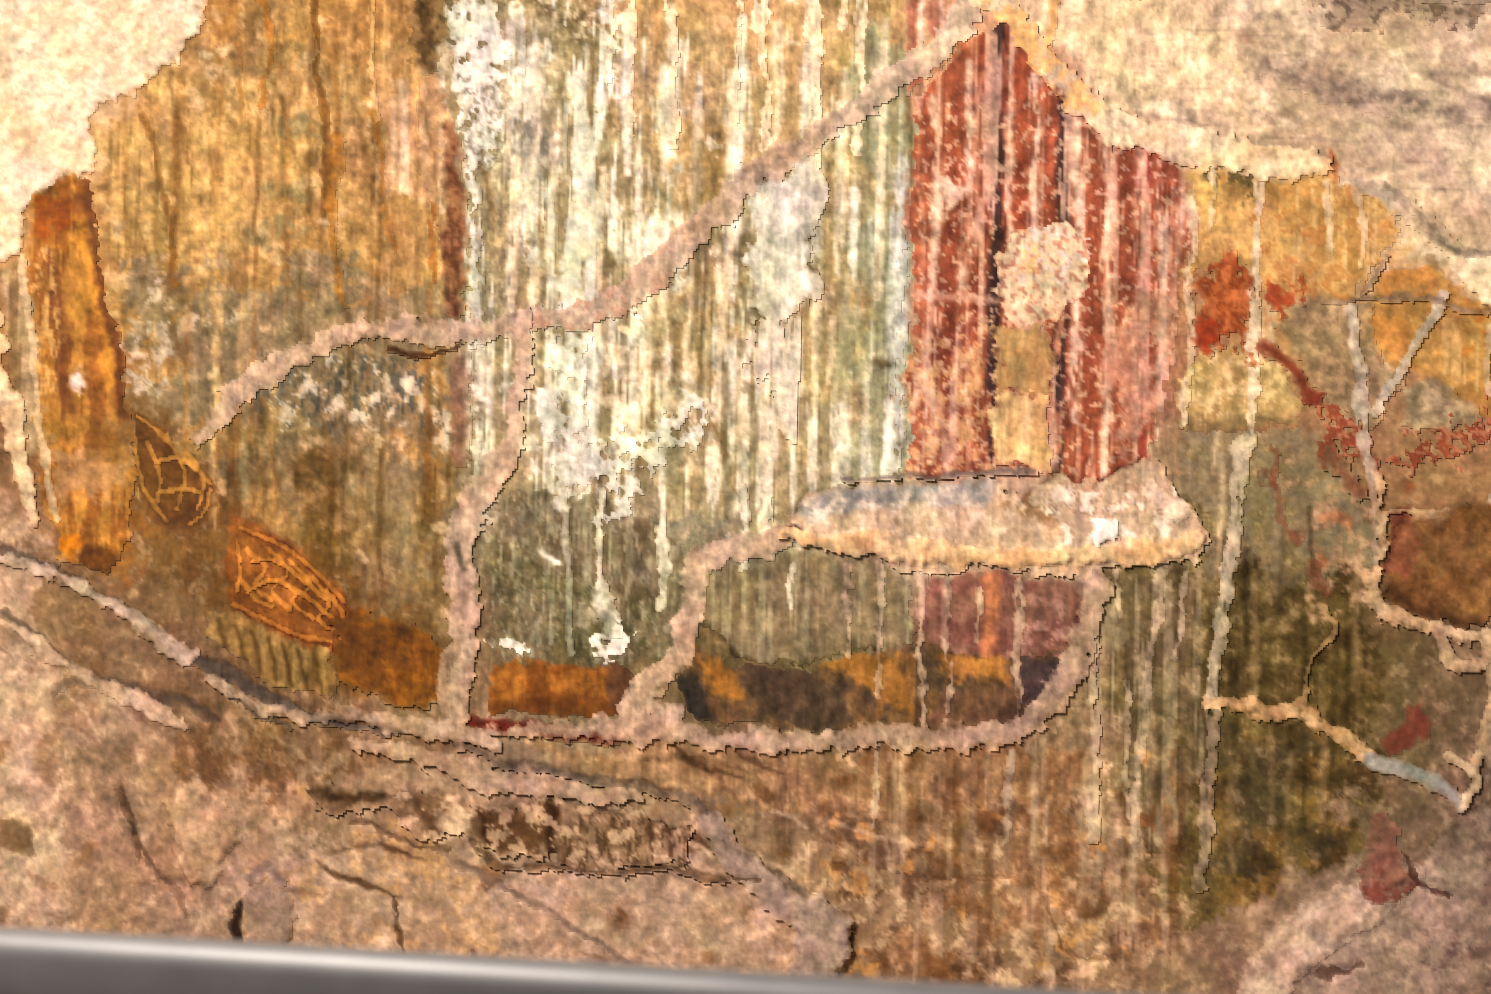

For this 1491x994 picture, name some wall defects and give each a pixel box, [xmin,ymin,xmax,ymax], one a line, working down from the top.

flaking render [0,0,208,262]
leakage [405,0,529,322]
efflorescence [540,97,605,309]
leakage [737,148,830,444]
leakage [800,0,870,124]
crack [1301,254,1491,317]
crack [1384,181,1491,260]
crack [0,0,1121,964]
efflorescence [536,329,709,665]
crack [1201,472,1491,814]
spalling [1380,498,1491,630]
spalling [1236,796,1491,994]